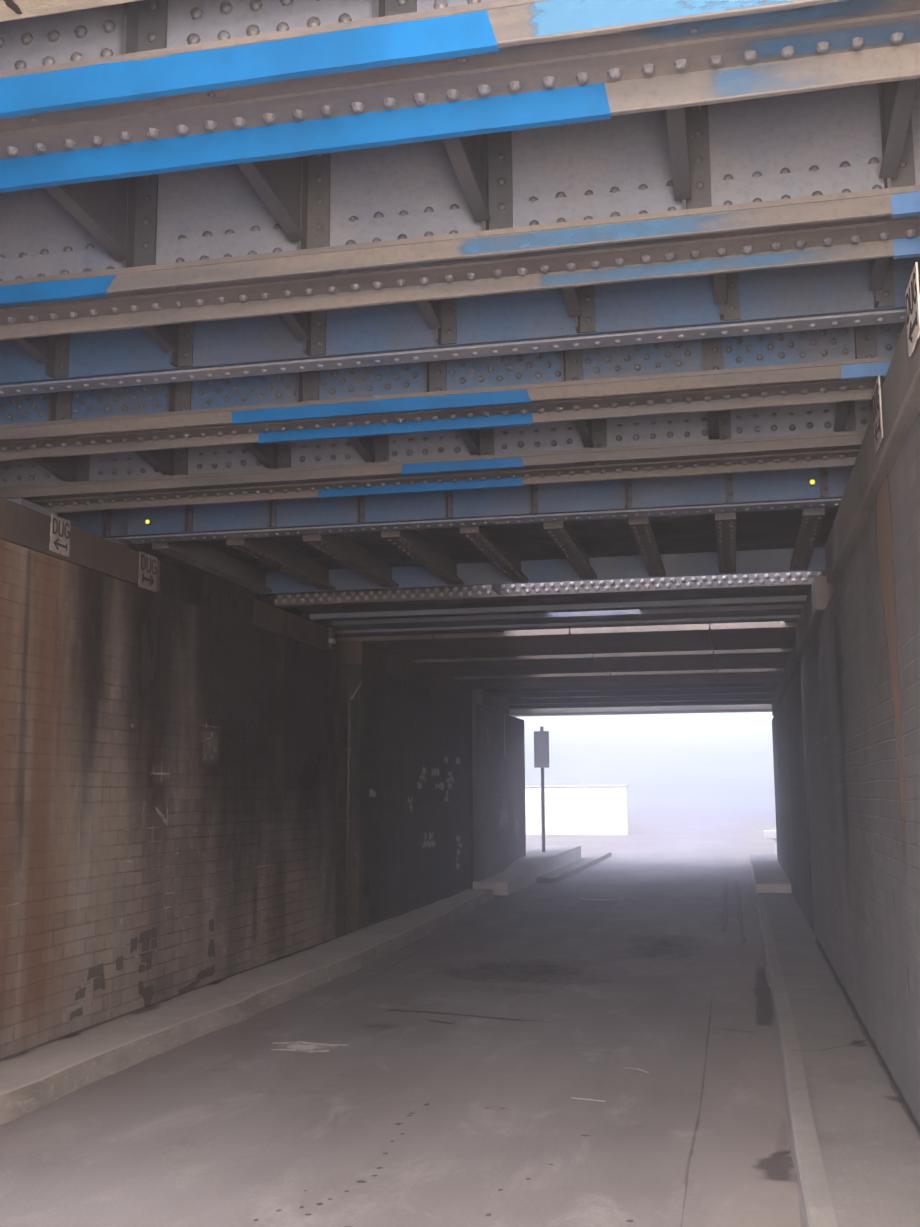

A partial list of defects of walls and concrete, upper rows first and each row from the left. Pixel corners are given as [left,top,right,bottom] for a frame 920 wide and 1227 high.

damp [79,565,105,761]
damp [125,535,342,850]
spalling [70,928,157,1020]